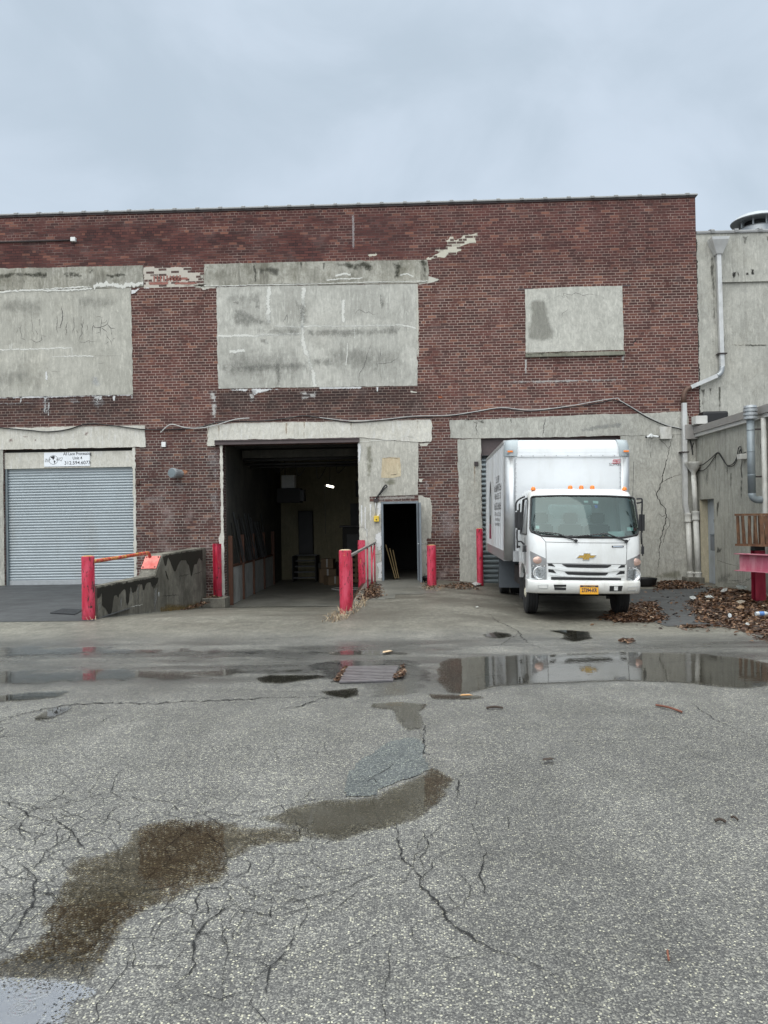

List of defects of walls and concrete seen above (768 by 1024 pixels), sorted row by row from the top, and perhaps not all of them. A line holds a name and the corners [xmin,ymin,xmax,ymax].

peeling [426,233,478,260]
peeling [131,267,216,294]
crack [655,440,681,572]
leakage [97,550,203,614]